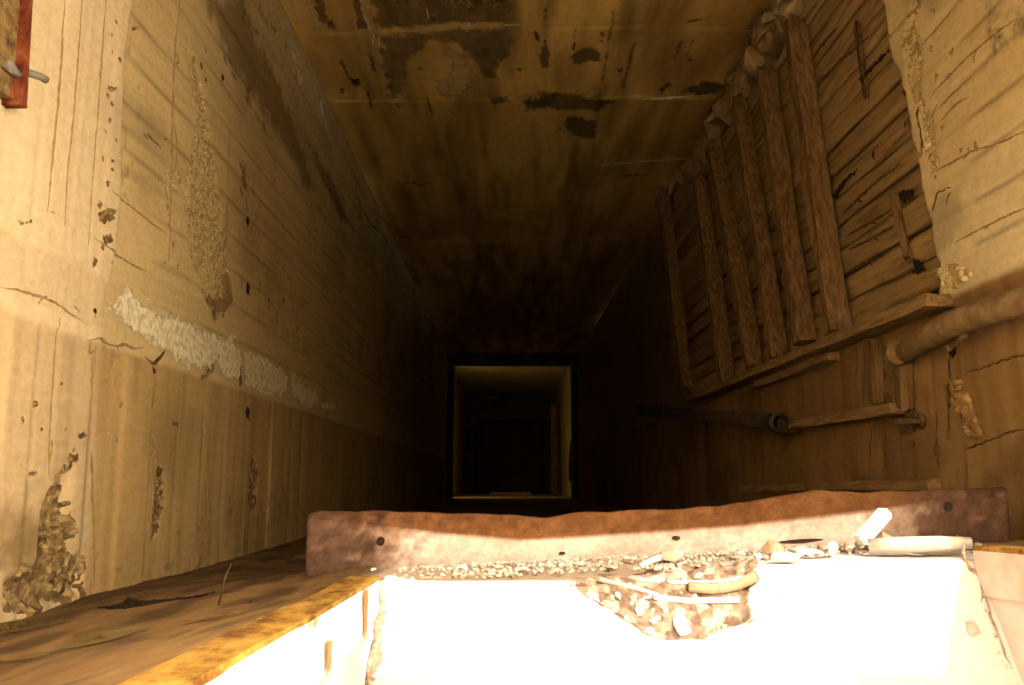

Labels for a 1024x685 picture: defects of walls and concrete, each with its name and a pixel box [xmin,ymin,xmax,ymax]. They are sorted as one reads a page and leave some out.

damp [359,0,520,105]
damp [534,31,550,68]
damp [571,32,611,64]
damp [640,81,724,100]
damp [525,92,614,139]
damp [208,259,232,320]
spalling [945,333,982,440]
crack [967,354,1024,373]
crack [2,287,165,590]
crack [965,428,1024,450]
spalling [151,465,165,540]